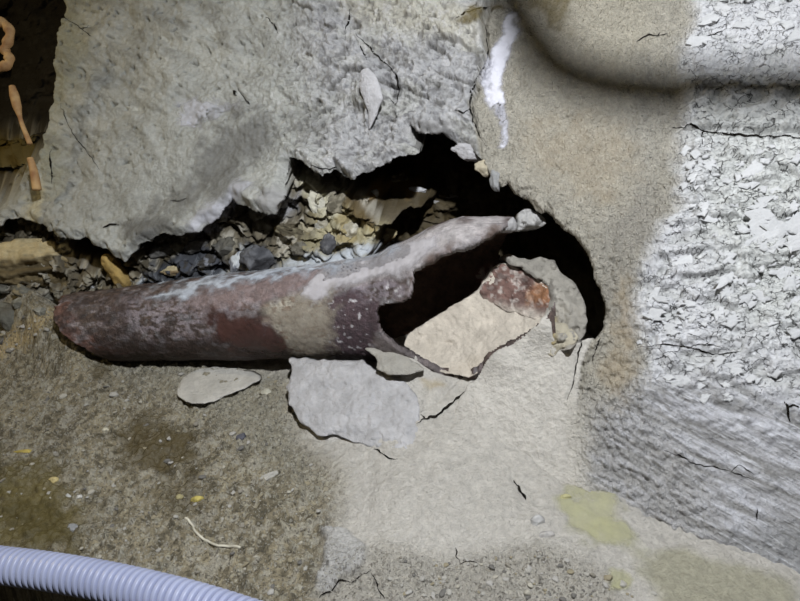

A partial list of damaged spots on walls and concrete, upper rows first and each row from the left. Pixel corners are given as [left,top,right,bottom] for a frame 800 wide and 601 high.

flaking render [685,0,800,49]
damp [481,12,519,148]
crack [673,123,800,144]
spalling [44,157,339,305]
spalling [502,217,517,233]
flaking render [643,144,800,345]
corrosion [208,306,291,359]
peeling [365,348,424,375]
flaking render [663,335,783,404]